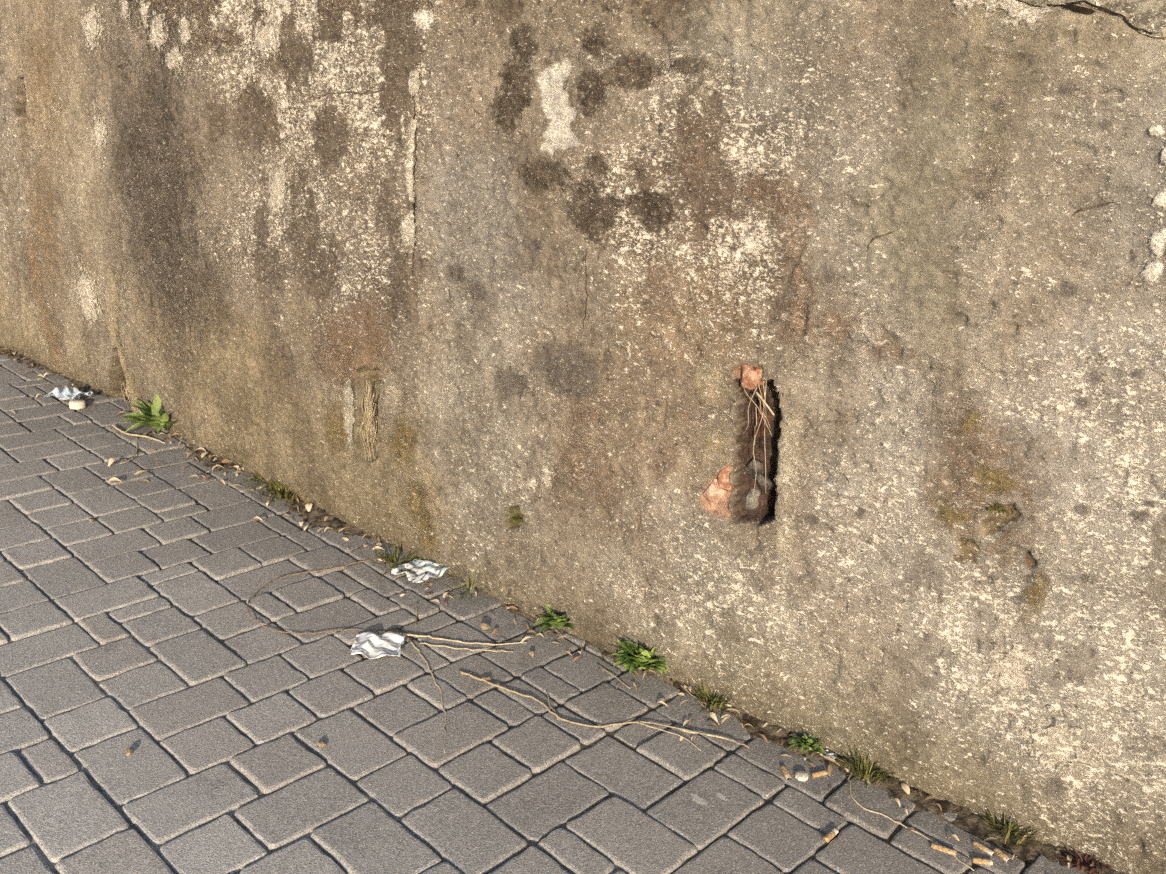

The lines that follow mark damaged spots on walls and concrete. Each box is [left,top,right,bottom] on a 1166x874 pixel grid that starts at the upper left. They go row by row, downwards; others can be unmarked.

efflorescence [78,0,105,53]
damp [583,27,604,54]
crack [1046,0,1160,38]
damp [489,27,537,131]
damp [572,52,709,115]
damp [90,0,283,364]
efflorescence [266,156,291,222]
crack [309,86,417,277]
damp [517,154,682,244]
efflorescence [70,257,106,329]
peeling [698,361,765,407]
spalling [696,429,731,522]